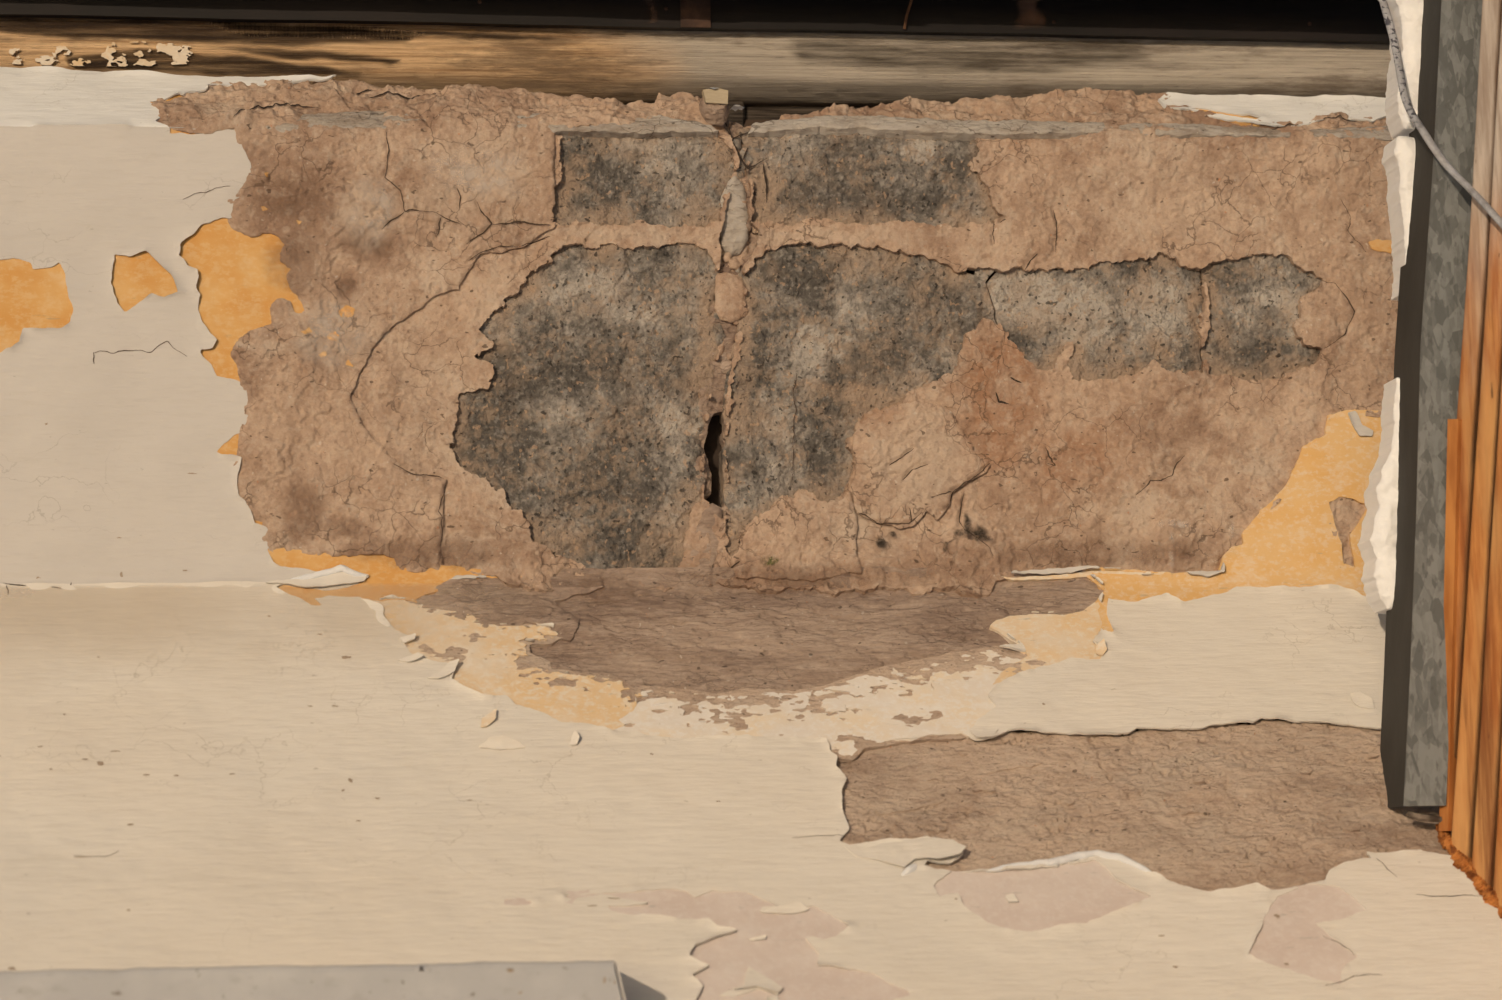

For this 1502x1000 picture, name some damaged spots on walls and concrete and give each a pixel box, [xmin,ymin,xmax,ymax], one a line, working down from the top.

peeling [9,41,193,67]
crack [233,103,321,117]
crack [357,89,441,99]
crack [383,132,550,260]
crack [725,123,768,203]
peeling [0,258,73,353]
peeling [111,251,177,311]
spalling [150,79,1452,1000]